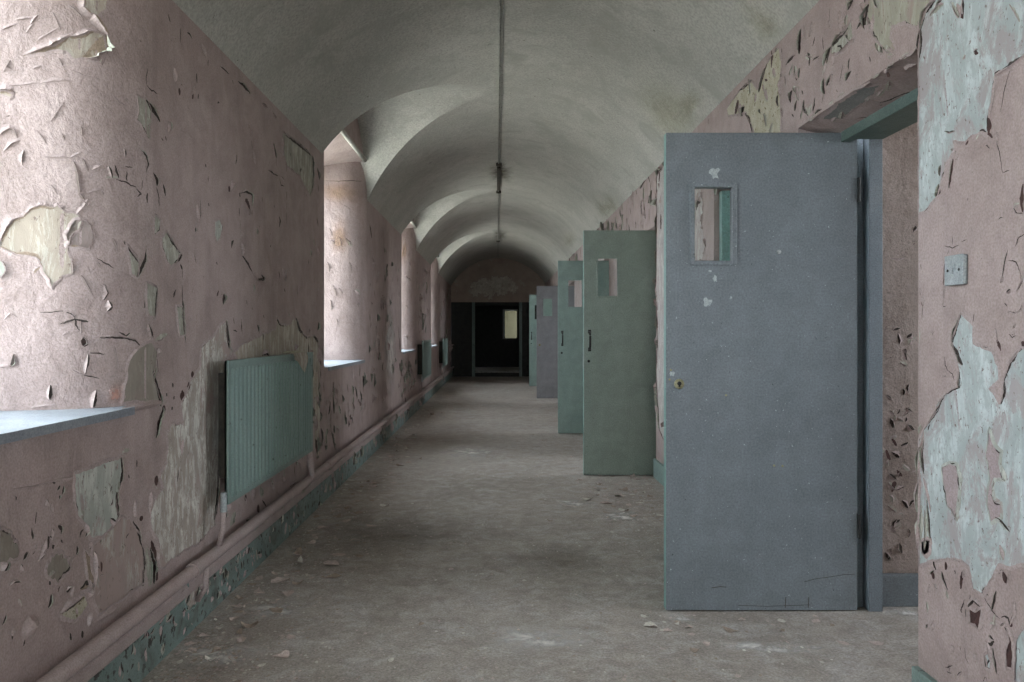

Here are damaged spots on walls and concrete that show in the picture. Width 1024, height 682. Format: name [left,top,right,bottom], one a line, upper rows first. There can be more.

peeling [0,200,95,291]
peeling [23,0,115,66]
peeling [596,162,675,440]
peeling [727,0,1024,232]
flaking render [0,227,451,682]
peeling [883,311,1024,682]